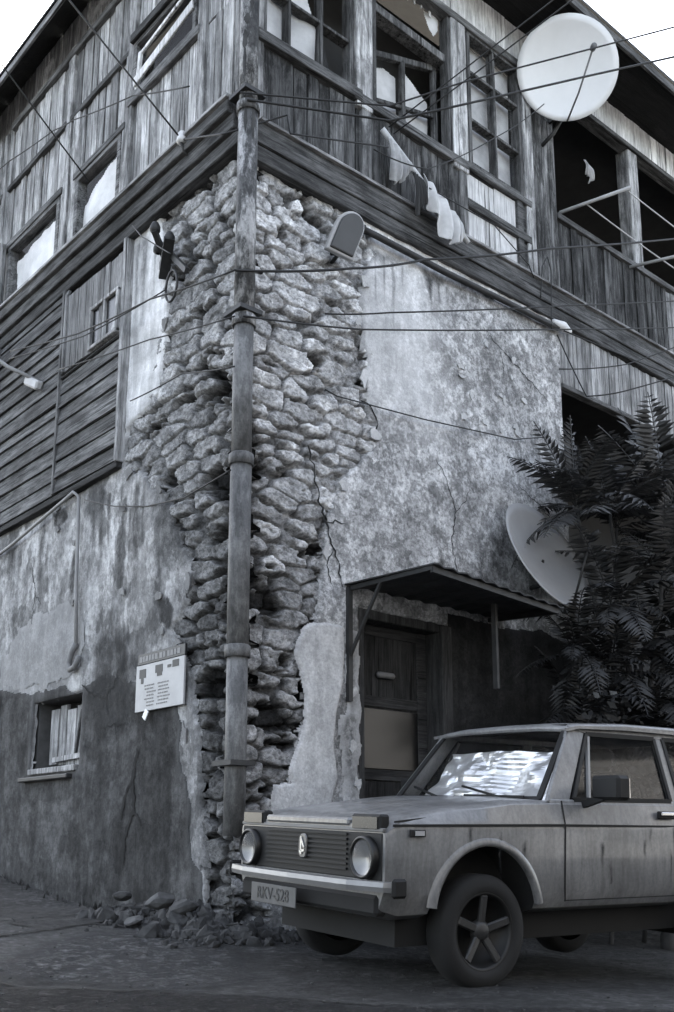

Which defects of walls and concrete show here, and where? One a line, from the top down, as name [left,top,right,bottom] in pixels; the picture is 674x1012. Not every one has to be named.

peeling [359,369,369,389]
peeling [370,428,382,440]
crack [436,461,470,571]
spalling [154,591,181,646]
leakage [92,631,131,737]
crack [82,669,141,866]
peeling [338,630,362,801]